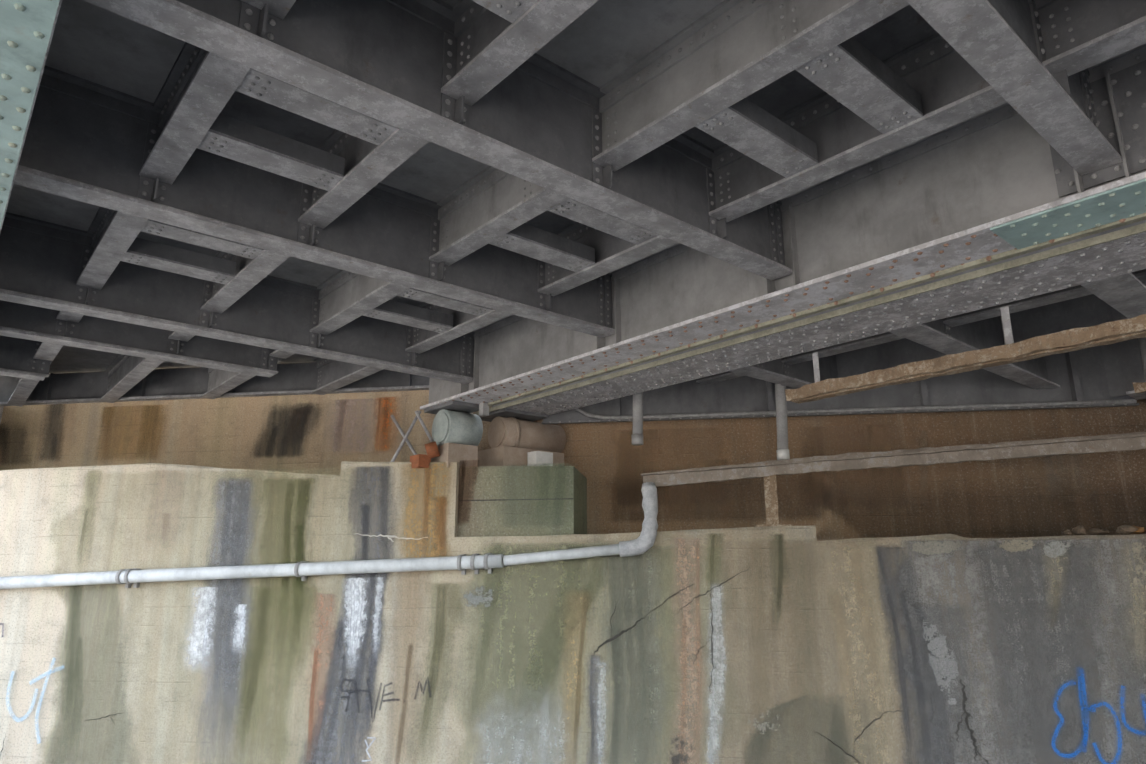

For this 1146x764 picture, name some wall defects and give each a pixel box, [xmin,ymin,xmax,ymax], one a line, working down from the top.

water stain [255,407,318,456]
rust [378,397,393,450]
crack [593,568,749,689]
spalling [922,619,959,705]
water stain [878,524,1146,764]
crack [815,710,899,764]
crack [955,679,989,764]